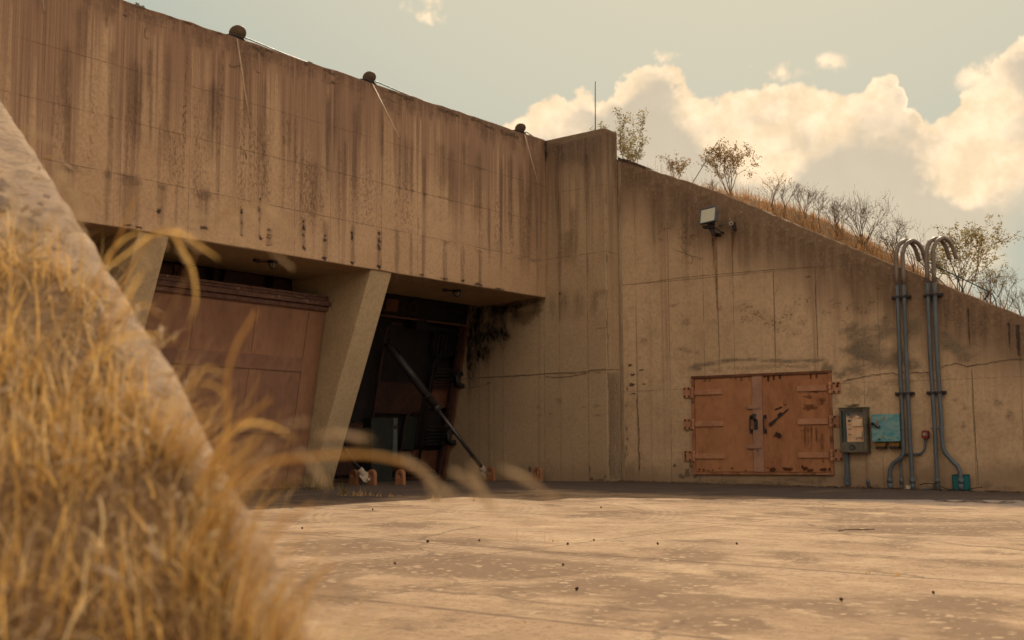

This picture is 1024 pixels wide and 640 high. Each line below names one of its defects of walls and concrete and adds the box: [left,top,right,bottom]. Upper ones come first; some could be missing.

crack [844,358,1022,487]